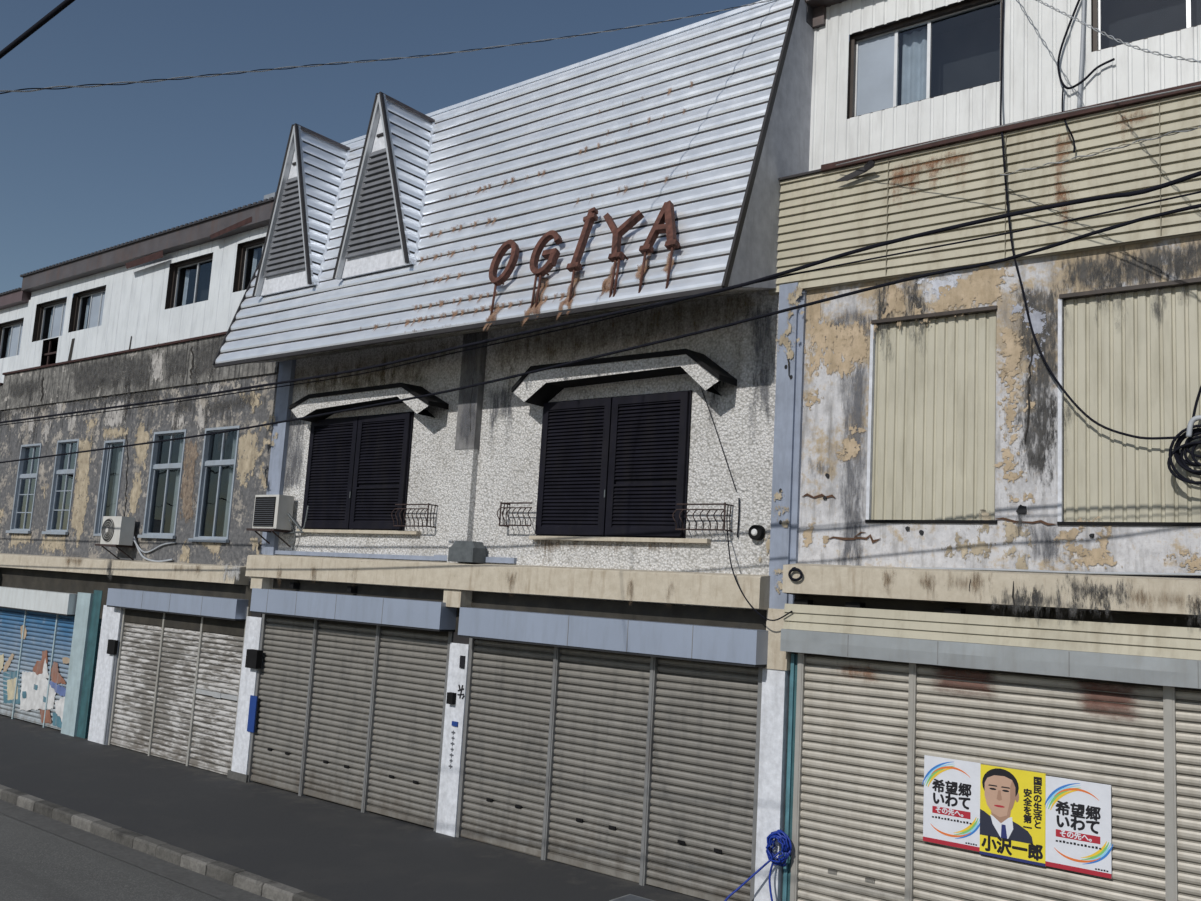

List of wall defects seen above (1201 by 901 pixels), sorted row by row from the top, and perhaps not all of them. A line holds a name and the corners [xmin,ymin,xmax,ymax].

rust [601,262,618,296]
rust [636,250,675,281]
peeling [8,401,152,554]
leakage [72,337,255,437]
peeling [167,383,223,523]
peeling [236,387,278,492]
leakage [266,290,776,440]
peeling [775,262,1050,570]
leakage [1015,241,1201,480]
leakage [993,574,1138,616]
rust [939,668,991,692]
rust [1080,680,1133,715]